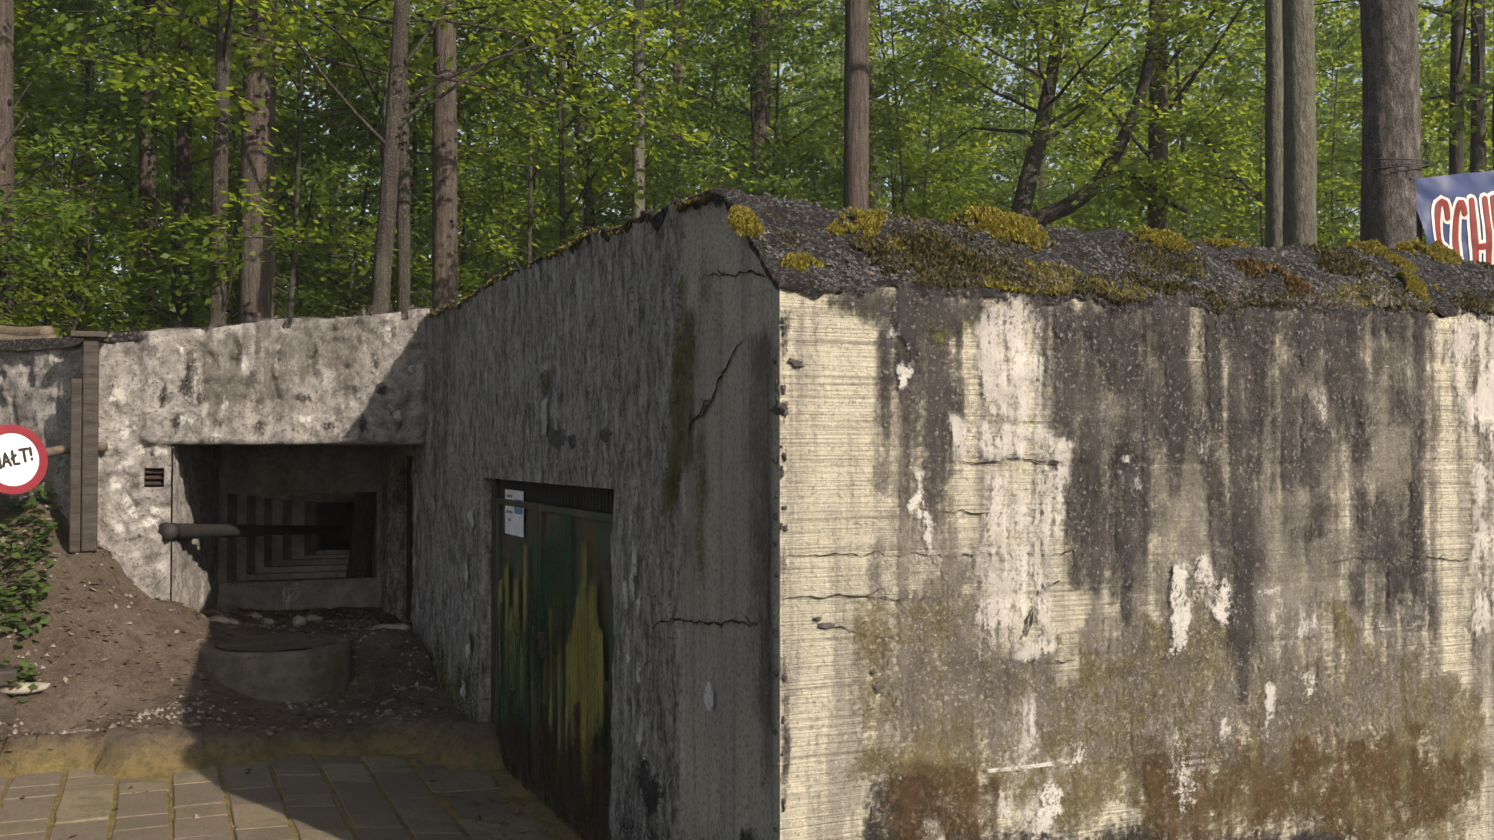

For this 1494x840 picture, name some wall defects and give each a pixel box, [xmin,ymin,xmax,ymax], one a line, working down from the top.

crack [671,341,742,464]
crack [963,453,1061,464]
water stain [830,285,1438,737]
crack [651,508,1140,664]
water stain [609,754,670,840]
water stain [857,692,1365,840]